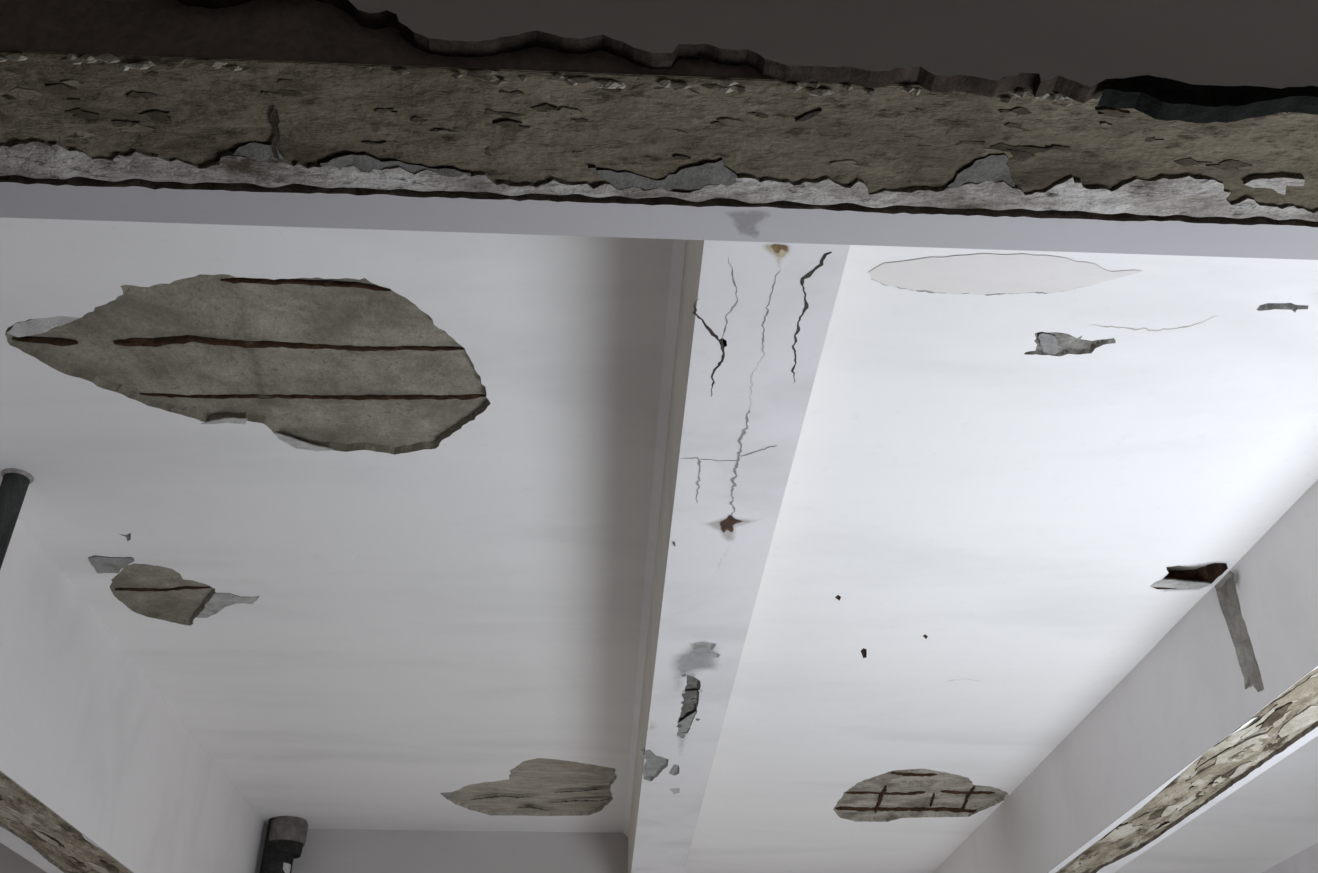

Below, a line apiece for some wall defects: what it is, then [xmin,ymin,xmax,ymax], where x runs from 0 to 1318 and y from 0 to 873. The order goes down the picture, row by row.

spalling [0,0,1318,222]
spalling [5,274,491,455]
crack [682,252,832,515]
spalling [1024,332,1116,356]
spalling [1257,303,1308,313]
spalling [88,533,260,626]
flaking render [676,673,703,738]
spalling [1056,563,1318,873]
spalling [0,771,133,873]
spalling [440,758,617,816]
flaking render [641,749,680,794]
spalling [833,769,1008,822]